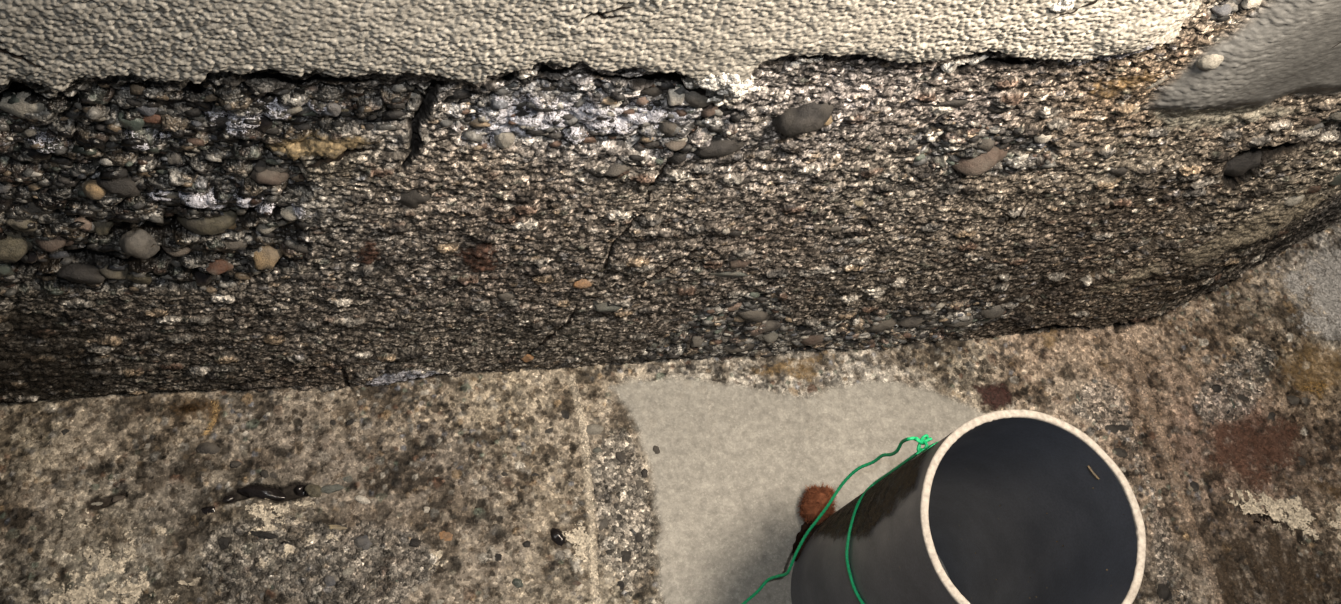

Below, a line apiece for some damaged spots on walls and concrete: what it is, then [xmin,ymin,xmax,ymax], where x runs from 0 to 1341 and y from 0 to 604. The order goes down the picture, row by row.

crack [1053,0,1098,19]
crack [0,42,49,71]
flaking render [0,89,46,119]
efflorescence [469,91,691,147]
flaking render [636,87,745,164]
efflorescence [681,72,756,109]
flaking render [772,101,834,137]
flaking render [933,98,968,108]
flaking render [987,106,1011,114]
flaking render [1034,134,1052,144]
flaking render [395,172,431,208]
flaking render [0,179,298,286]